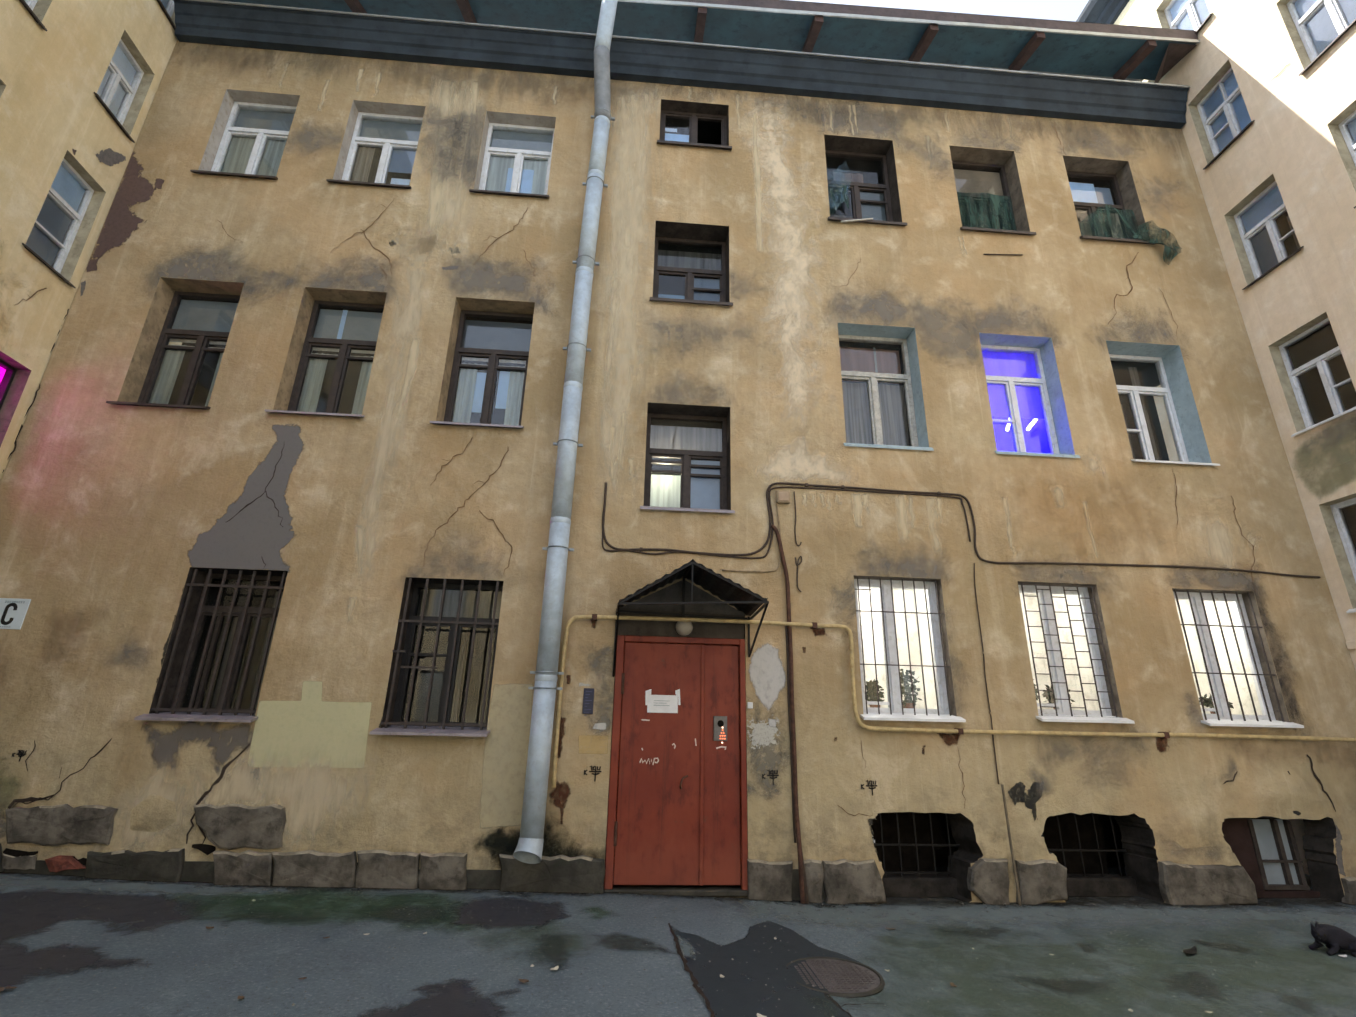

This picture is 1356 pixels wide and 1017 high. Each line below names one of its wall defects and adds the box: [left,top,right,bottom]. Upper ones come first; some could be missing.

flaking render [80,148,165,296]
crack [331,199,394,283]
crack [1108,252,1178,335]
crack [424,437,513,572]
crack [7,738,112,809]
crack [186,743,250,855]
crack [1288,755,1336,812]
crack [3,848,38,857]
crack [72,856,87,865]
leakage [477,830,520,867]
leakage [542,820,604,859]
flaking render [1335,826,1346,877]